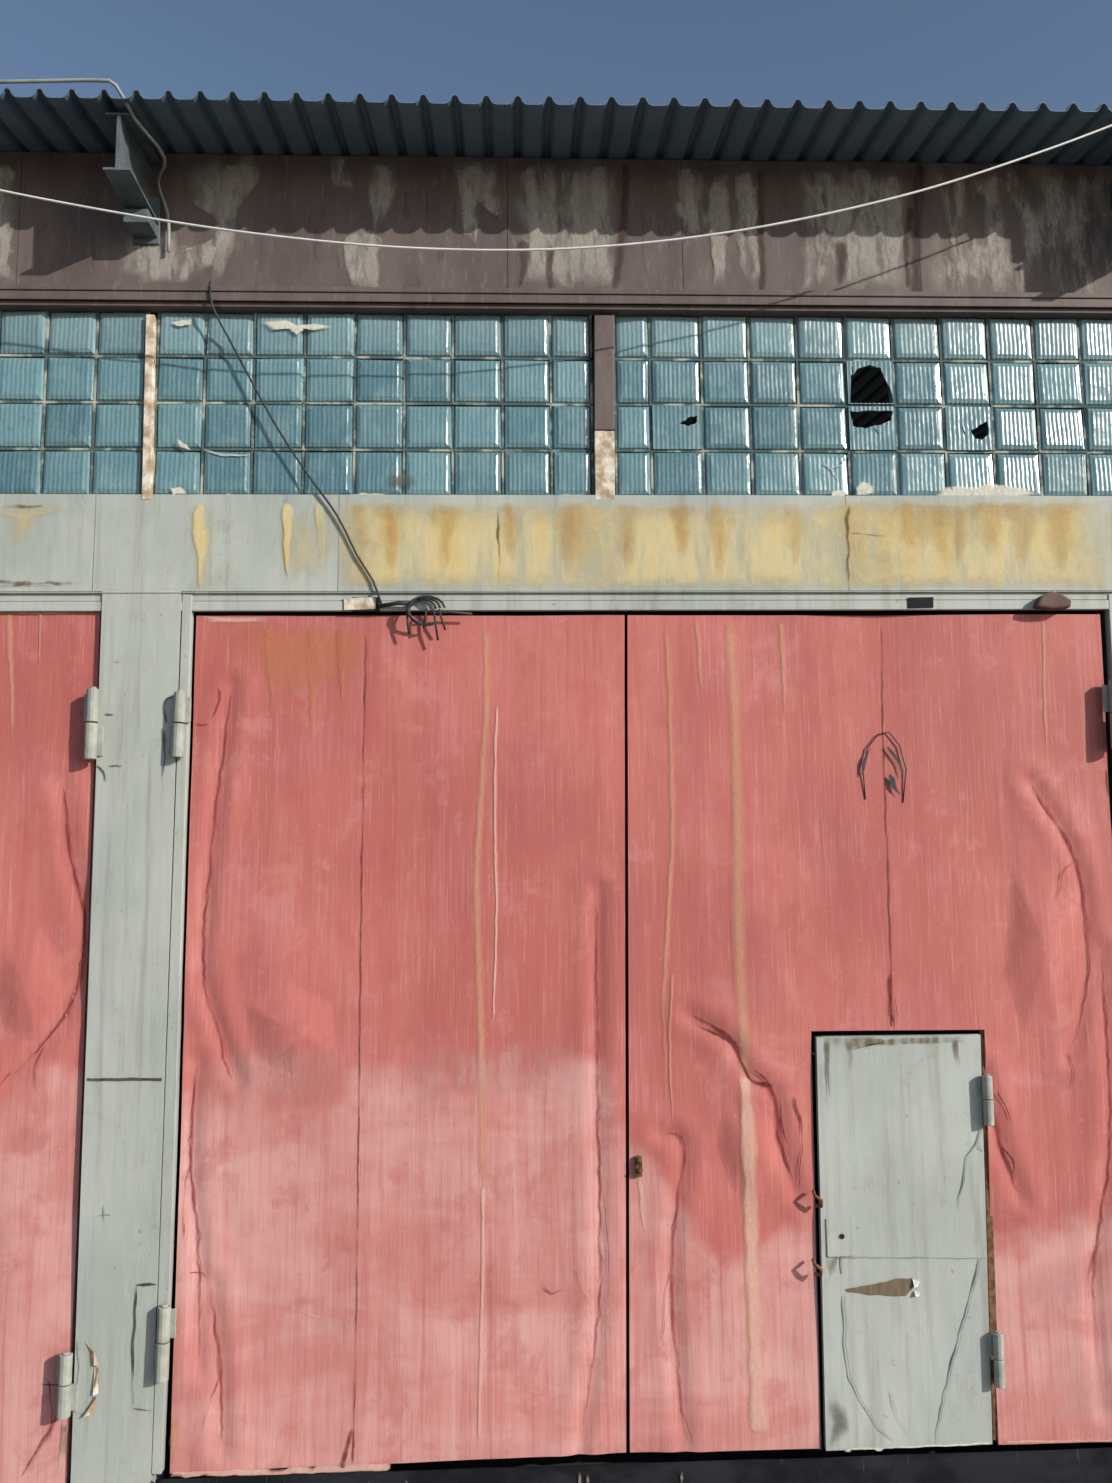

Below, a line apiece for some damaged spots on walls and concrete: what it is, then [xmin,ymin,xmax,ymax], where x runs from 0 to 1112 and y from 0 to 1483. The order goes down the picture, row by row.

peeling [0,167,14,277]
peeling [126,159,258,280]
peeling [344,165,394,287]
peeling [456,162,498,238]
peeling [518,167,612,283]
peeling [677,169,760,279]
peeling [804,169,902,285]
peeling [936,171,1109,293]
water stain [741,1078,767,1430]
water stain [835,1413,846,1435]